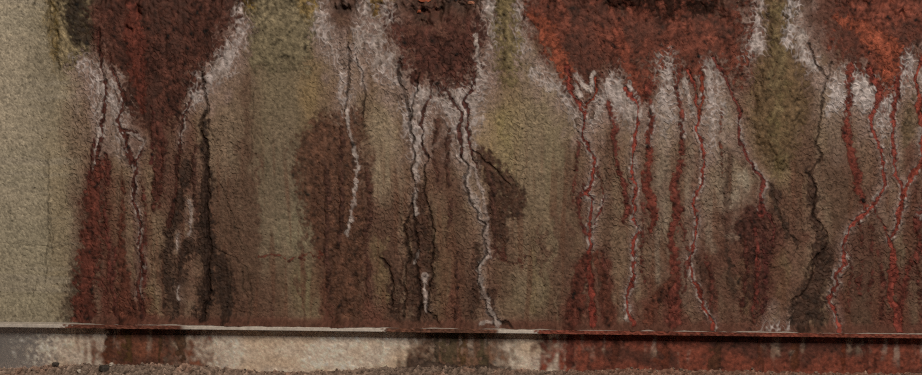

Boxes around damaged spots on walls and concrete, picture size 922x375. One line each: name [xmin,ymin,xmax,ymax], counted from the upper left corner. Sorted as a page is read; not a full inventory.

leakage [28,259,116,366]
corrosion [63,0,243,367]
crack [199,78,211,321]
corrosion [258,126,346,298]
leakage [159,0,574,372]
crack [381,62,437,320]
corrosion [384,9,526,268]
crack [460,152,512,328]
leakage [529,56,726,151]
corrosion [523,0,922,375]
crack [795,43,831,298]
leakage [823,52,922,174]